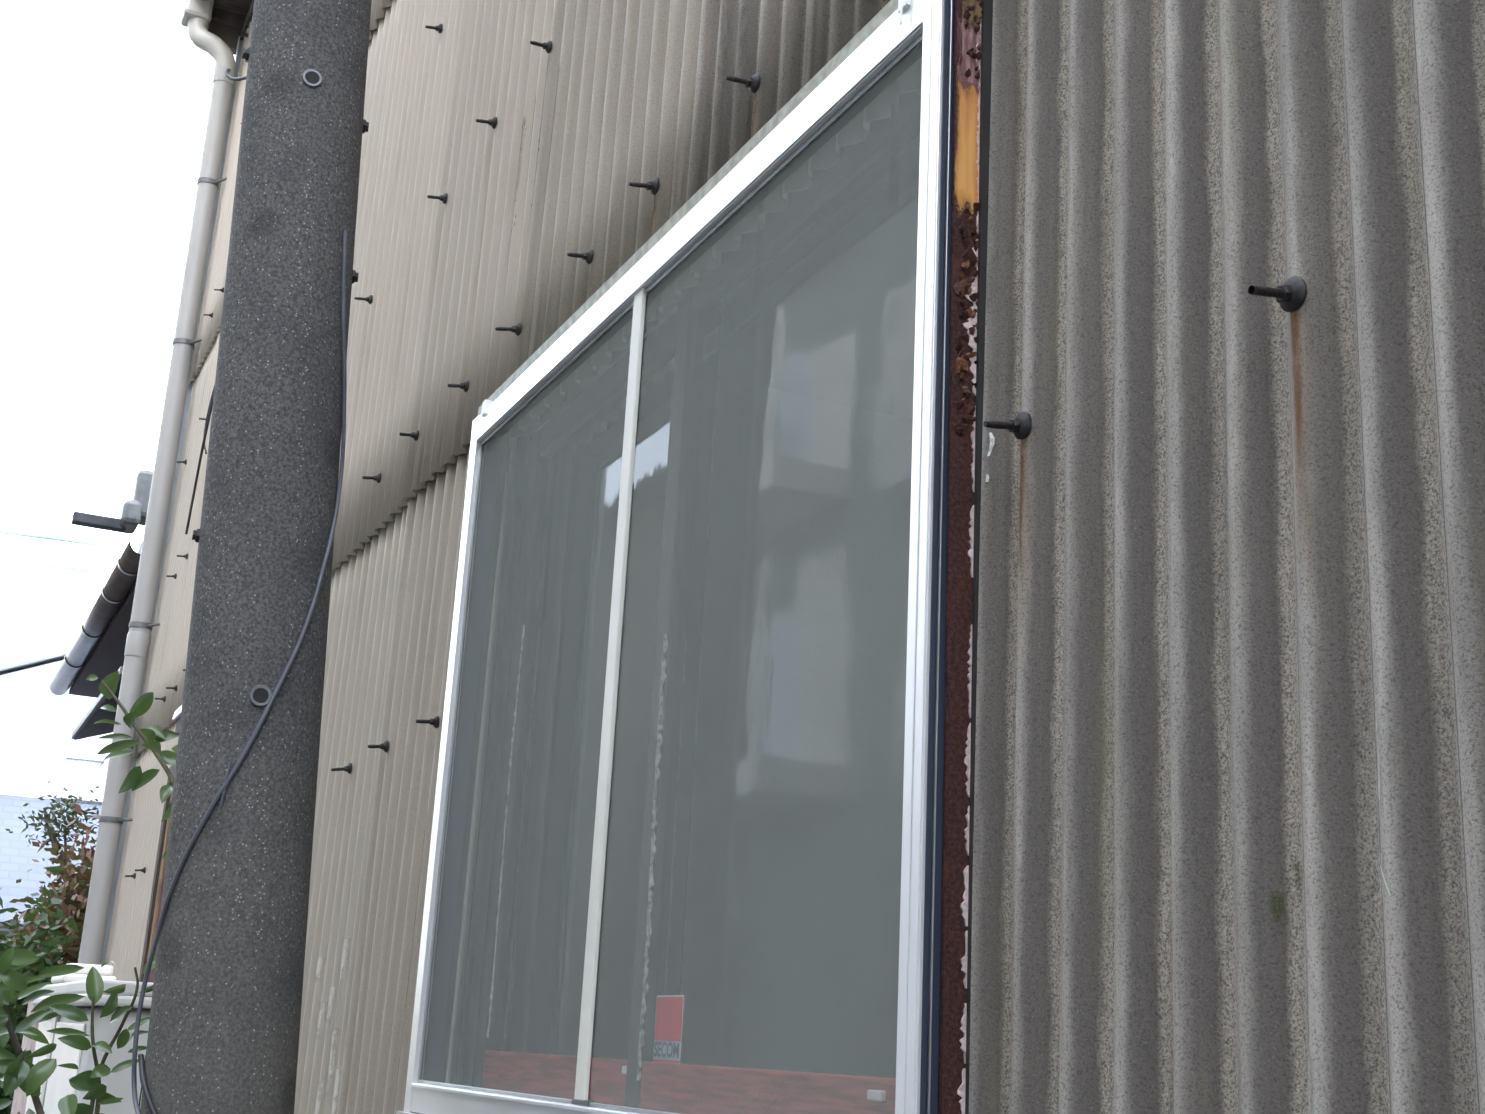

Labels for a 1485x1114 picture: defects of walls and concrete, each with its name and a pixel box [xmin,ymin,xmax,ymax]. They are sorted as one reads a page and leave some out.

corrosion [952,0,987,435]
peeling [963,23,981,578]
corrosion [1291,310,1301,462]
peeling [957,625,972,1114]